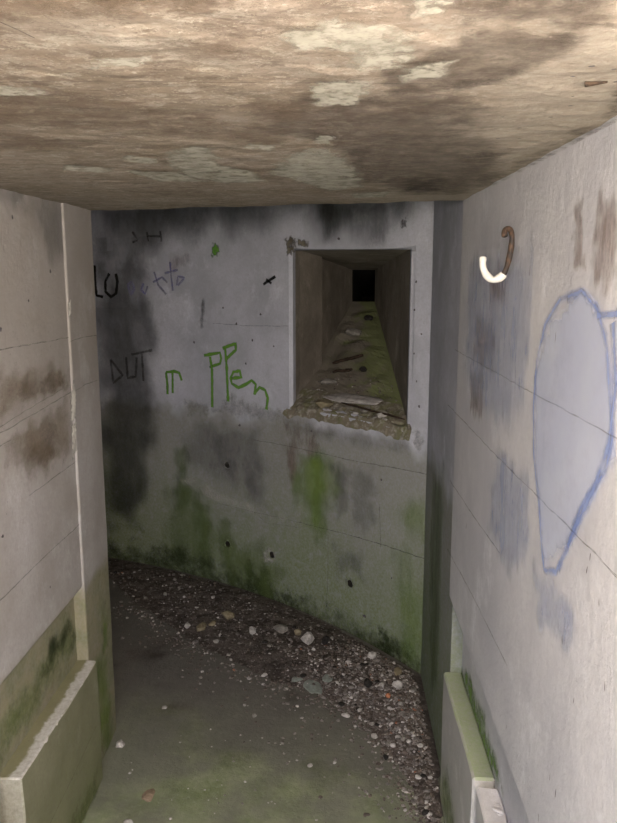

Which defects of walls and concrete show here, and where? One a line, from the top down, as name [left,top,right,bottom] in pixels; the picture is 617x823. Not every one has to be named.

water stain [417,0,606,89]
water stain [225,69,496,193]
water stain [111,207,208,246]
water stain [322,203,383,233]
water stain [105,274,150,514]
spalling [282,388,411,441]